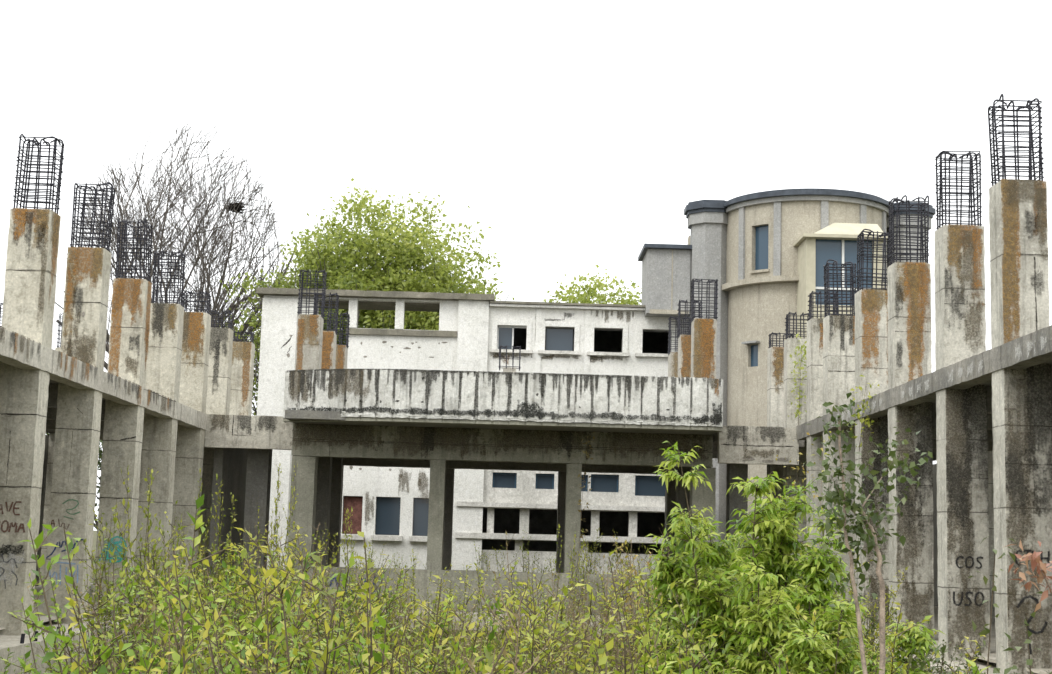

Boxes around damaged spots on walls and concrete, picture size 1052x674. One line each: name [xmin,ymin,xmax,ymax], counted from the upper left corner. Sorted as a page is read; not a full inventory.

corrosion [12,208,103,354]
corrosion [109,278,152,377]
corrosion [861,262,930,381]
corrosion [948,224,983,297]
corrosion [1001,179,1047,344]
water stain [211,414,276,434]
water stain [287,353,785,459]
water stain [399,471,428,498]
water stain [1004,338,1052,674]